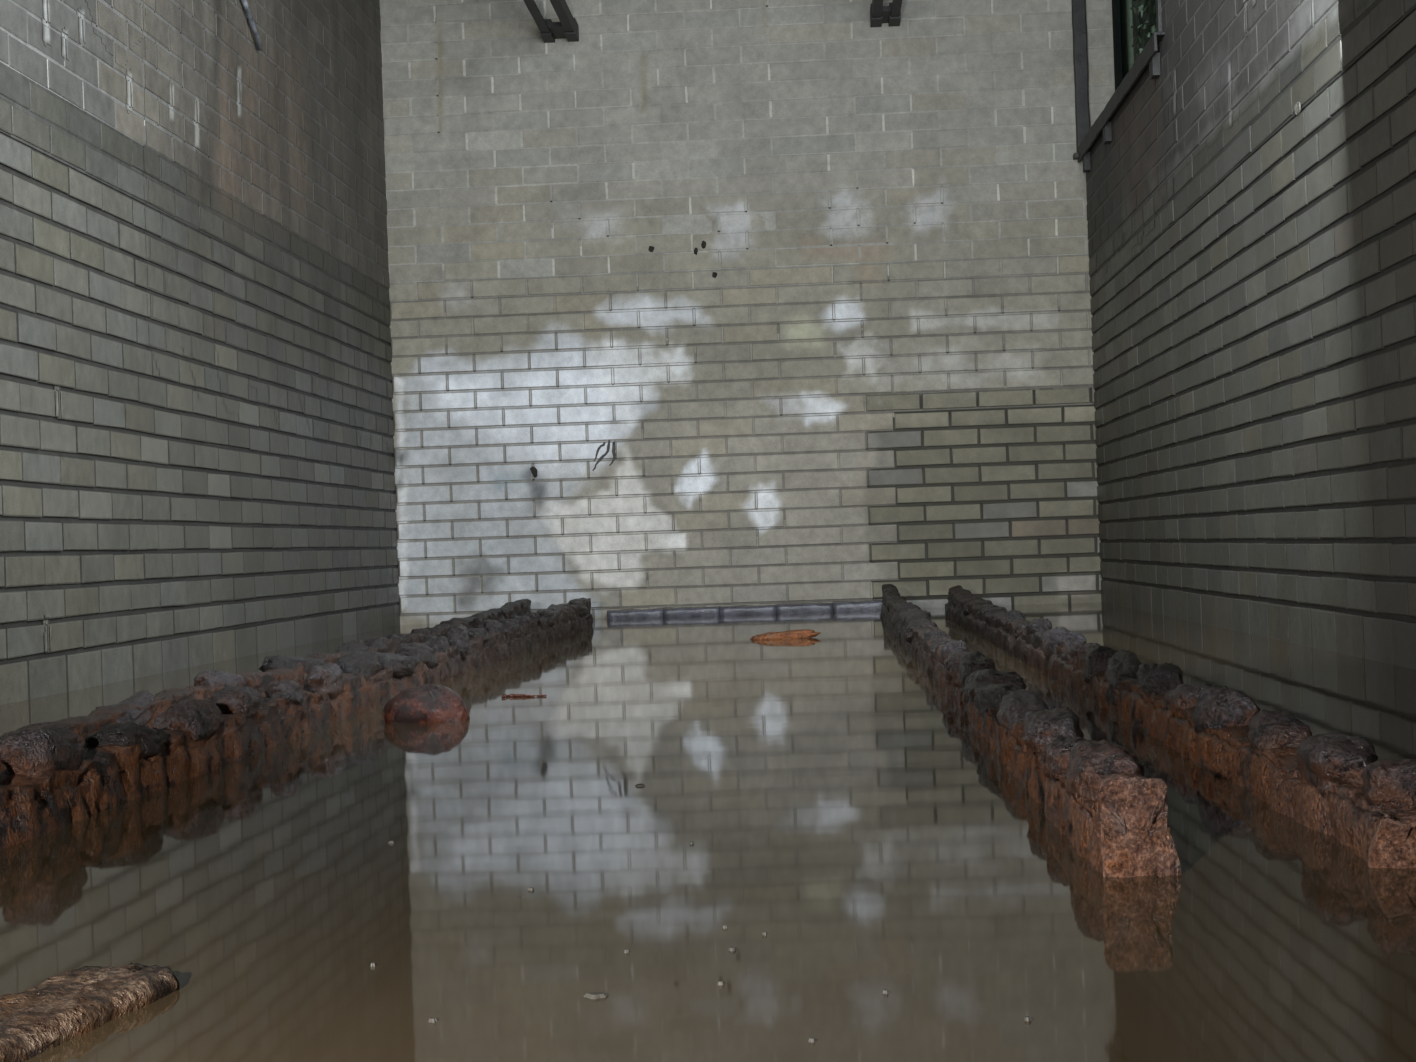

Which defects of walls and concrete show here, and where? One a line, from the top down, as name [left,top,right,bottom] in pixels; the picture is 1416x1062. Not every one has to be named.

damp [546,195,633,249]
damp [702,196,766,276]
damp [809,180,880,238]
damp [897,173,959,243]
damp [126,0,415,613]
damp [431,269,481,314]
damp [590,285,720,340]
damp [668,444,722,511]
damp [736,476,785,538]
damp [757,292,1102,604]
damp [444,544,518,618]